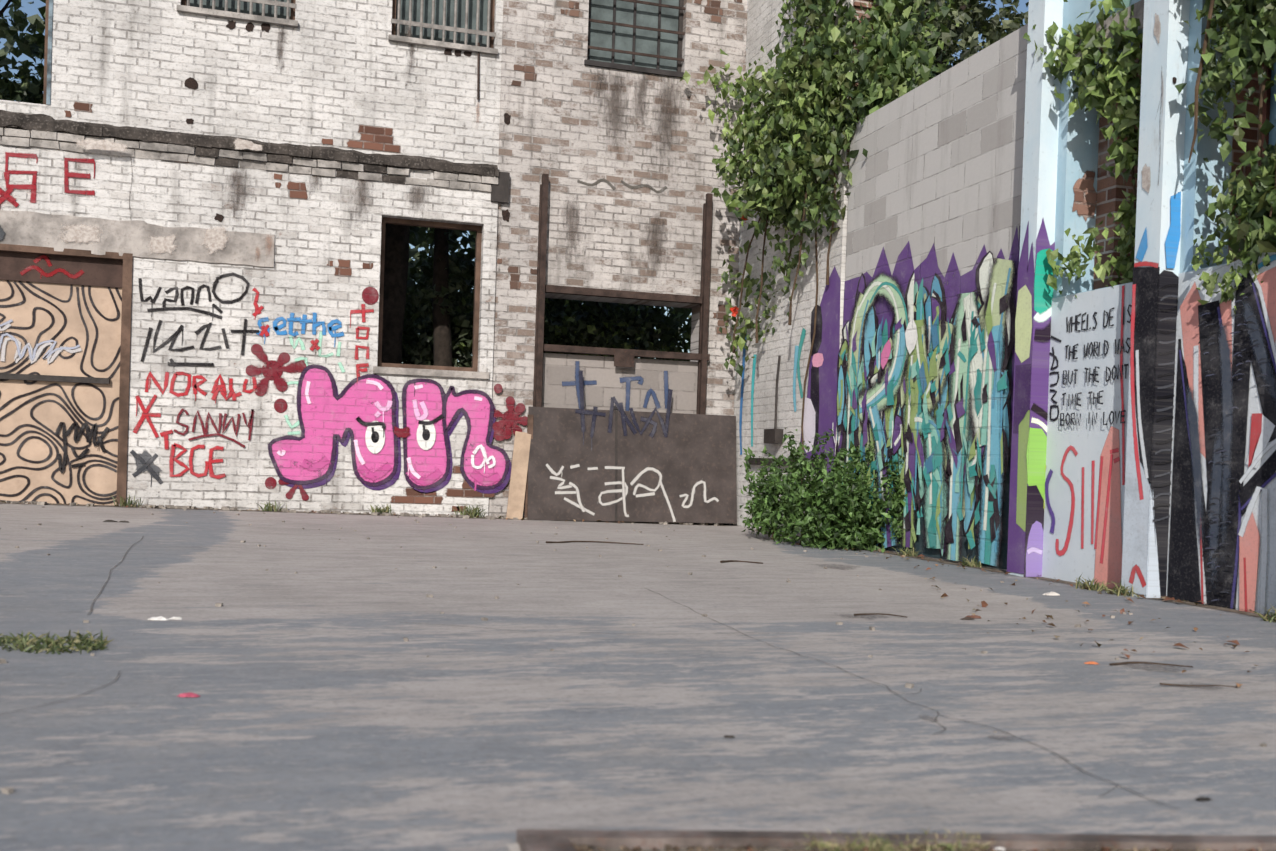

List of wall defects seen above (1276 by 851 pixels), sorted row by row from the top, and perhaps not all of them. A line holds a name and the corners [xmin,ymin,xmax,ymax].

damp [598,74,622,133]
damp [661,87,676,140]
damp [233,174,243,203]
flaking render [1072,171,1097,221]
damp [567,207,576,242]
damp [649,221,661,261]